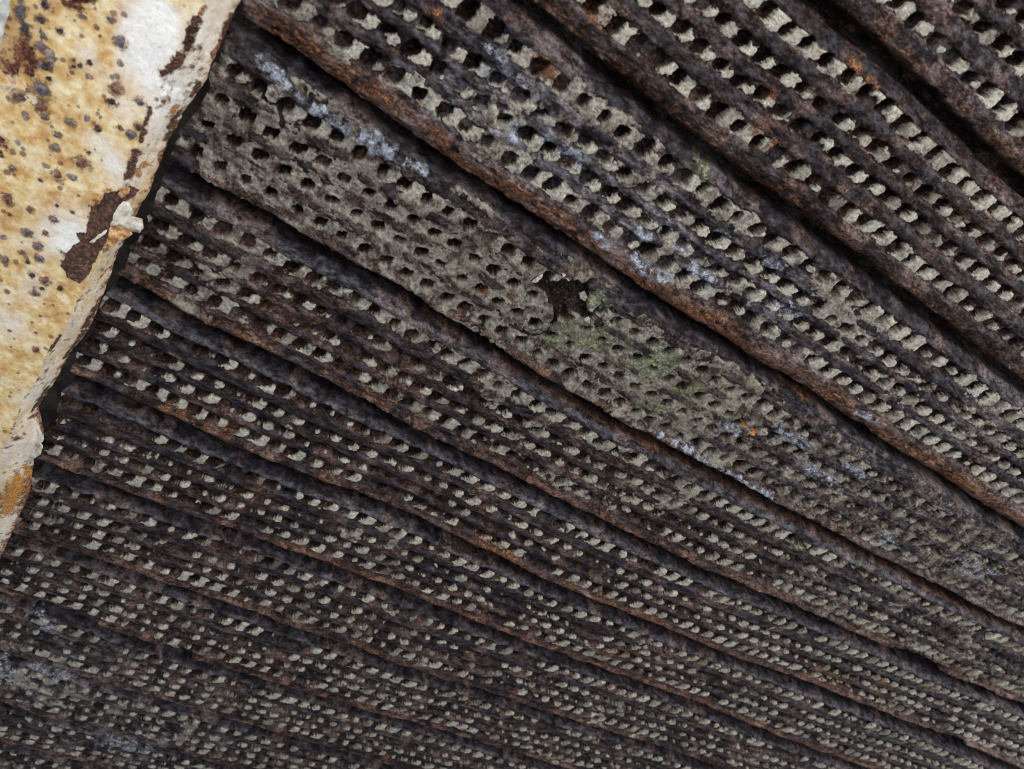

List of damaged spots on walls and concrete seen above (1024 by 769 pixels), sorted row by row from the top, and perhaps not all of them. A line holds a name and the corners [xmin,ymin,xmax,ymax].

corrosion [34,0,96,36]
corrosion [159,15,203,77]
corrosion [219,12,234,43]
corrosion [9,16,153,185]
corrosion [163,80,202,142]
corrosion [0,136,21,172]
corrosion [1,192,14,216]
corrosion [0,203,75,296]
peeling [60,186,143,284]
corrosion [30,305,99,359]
corrosion [0,463,33,518]
corrosion [439,532,518,562]